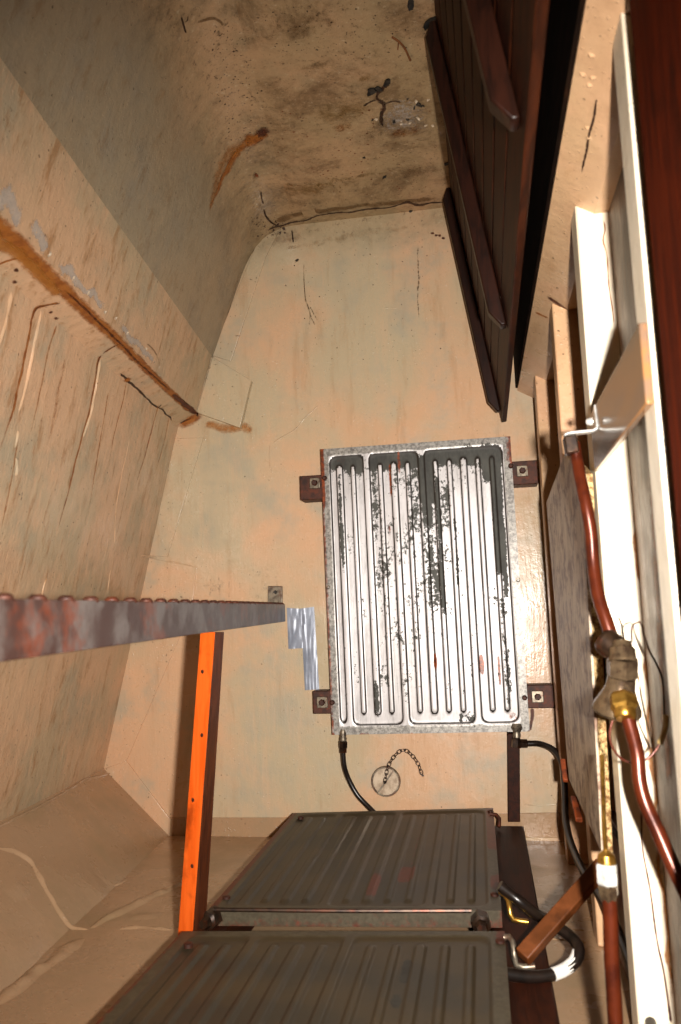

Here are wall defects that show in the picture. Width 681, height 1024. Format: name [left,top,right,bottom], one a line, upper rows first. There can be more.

rust [210,128,269,206]
crack [363,78,400,127]
crack [582,100,597,170]
crack [260,192,443,242]
rust [0,217,200,521]
crack [120,373,172,420]